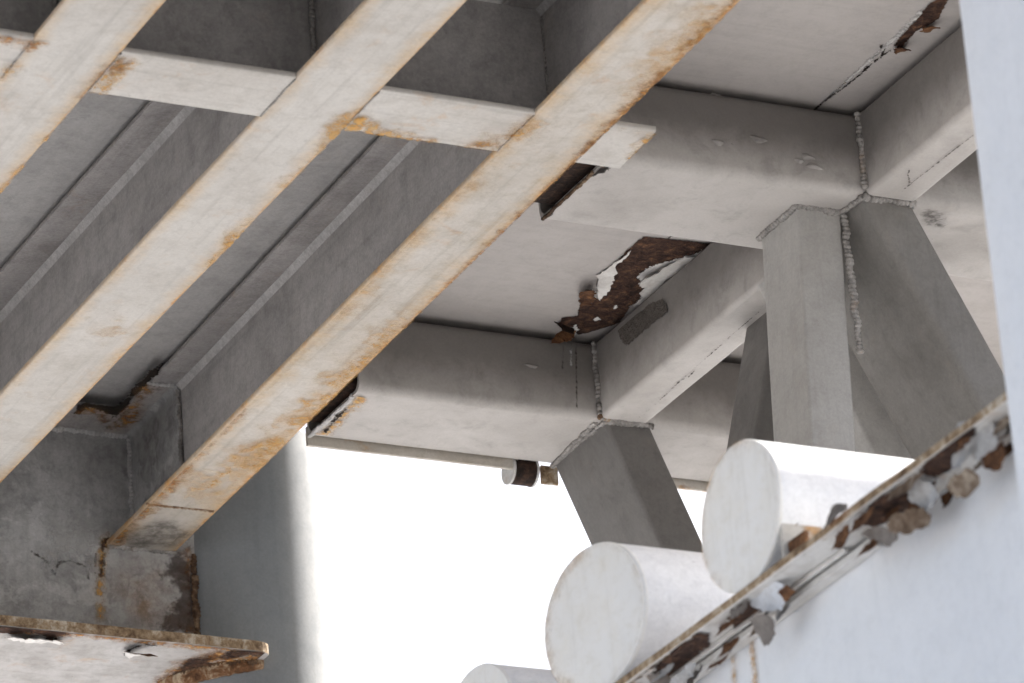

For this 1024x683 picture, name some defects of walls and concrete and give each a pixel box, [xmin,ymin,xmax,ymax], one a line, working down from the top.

spalling [894,0,948,54]
corrosion [327,114,432,142]
corrosion [533,0,735,203]
peeling [550,322,576,344]
corrosion [559,237,709,335]
peeling [618,297,668,345]
corrosion [322,397,365,435]
peeling [822,415,1014,558]
corrosion [96,454,202,618]
peeling [4,637,65,645]
corrosion [0,549,264,683]
peeling [645,582,796,683]